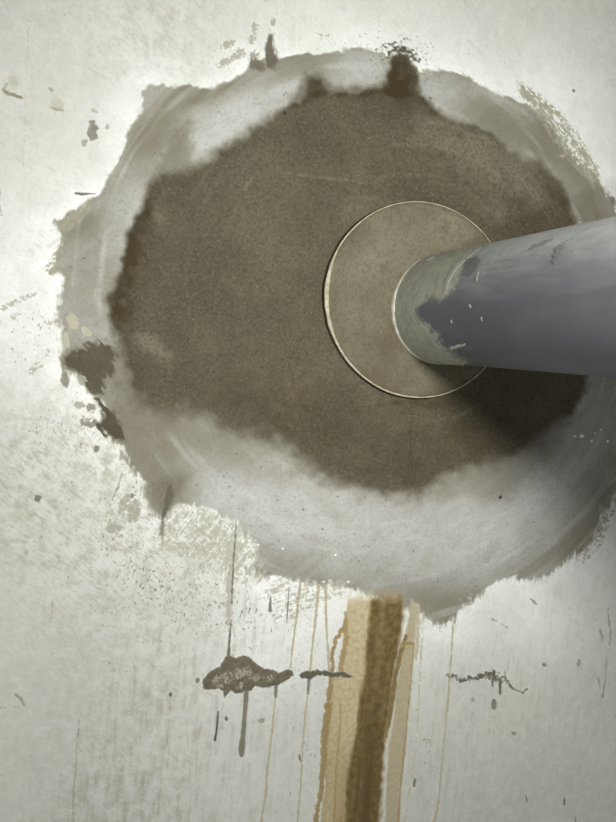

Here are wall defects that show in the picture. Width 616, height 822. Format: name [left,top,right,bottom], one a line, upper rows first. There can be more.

peeling [217,22,259,68]
peeling [82,109,109,146]
damp [63,34,588,498]
peeling [60,371,87,388]
peeling [74,401,96,428]
peeling [106,493,141,533]
rust [290,581,301,668]
rust [309,584,424,822]
crack [445,670,528,710]
rust [297,696,308,822]